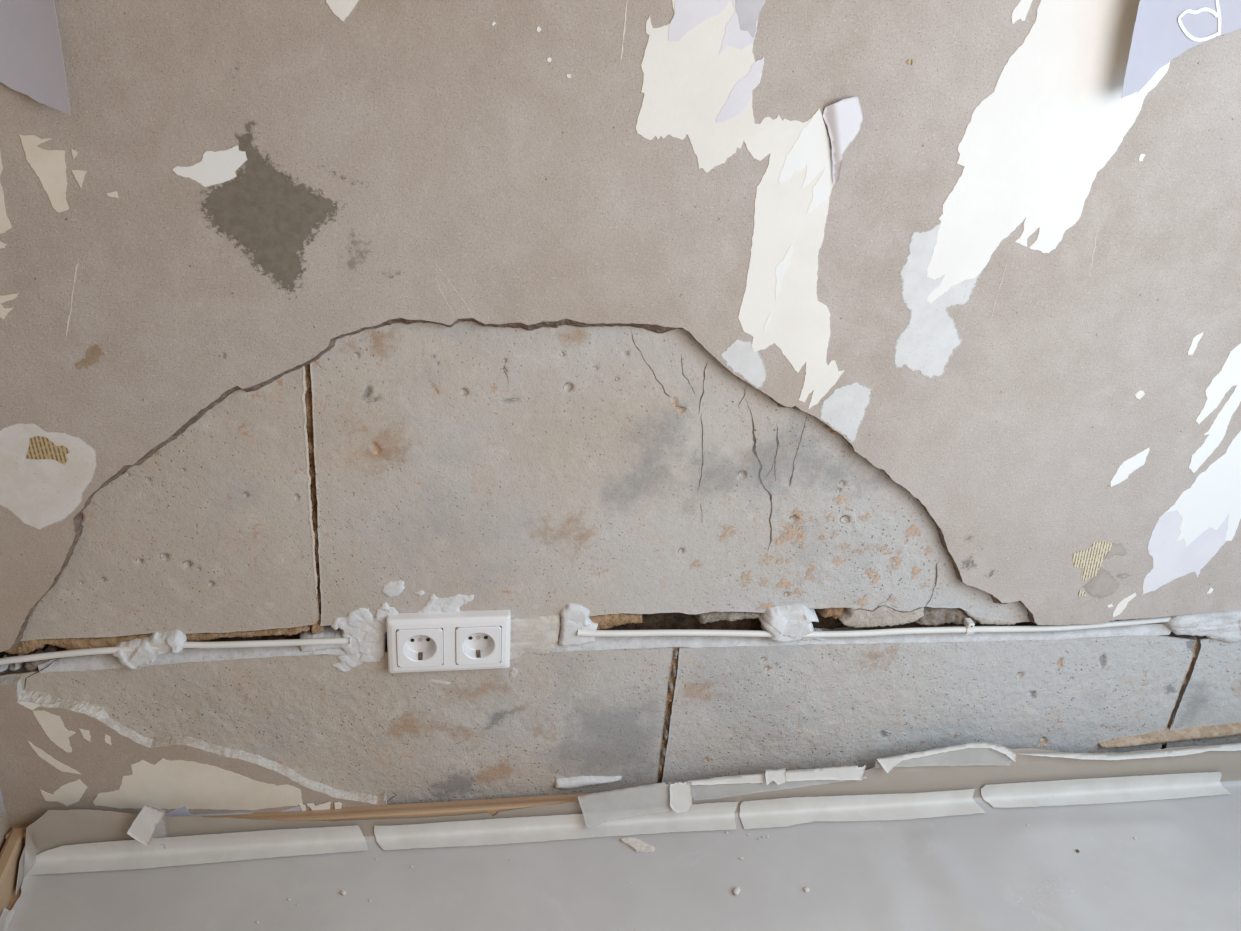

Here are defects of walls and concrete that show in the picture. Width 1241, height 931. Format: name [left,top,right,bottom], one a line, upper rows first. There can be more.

leakage [201,122,337,294]
crack [630,328,708,511]
crack [738,389,806,549]
flaking render [0,318,1241,805]
crack [852,562,939,612]